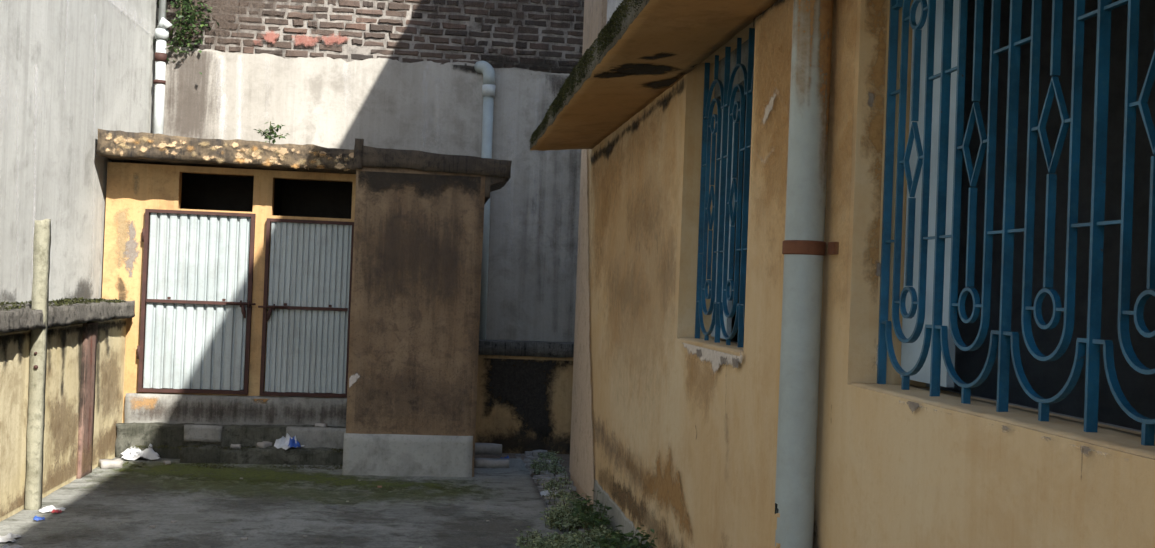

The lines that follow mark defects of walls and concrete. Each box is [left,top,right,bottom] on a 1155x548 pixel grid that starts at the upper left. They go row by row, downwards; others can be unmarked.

water stain [591,79,684,165]
water stain [0,332,31,365]
water stain [47,320,126,415]
water stain [478,358,573,454]
flaking render [683,343,742,372]
water stain [1,491,25,516]
water stain [42,422,117,493]
water stain [595,425,690,536]